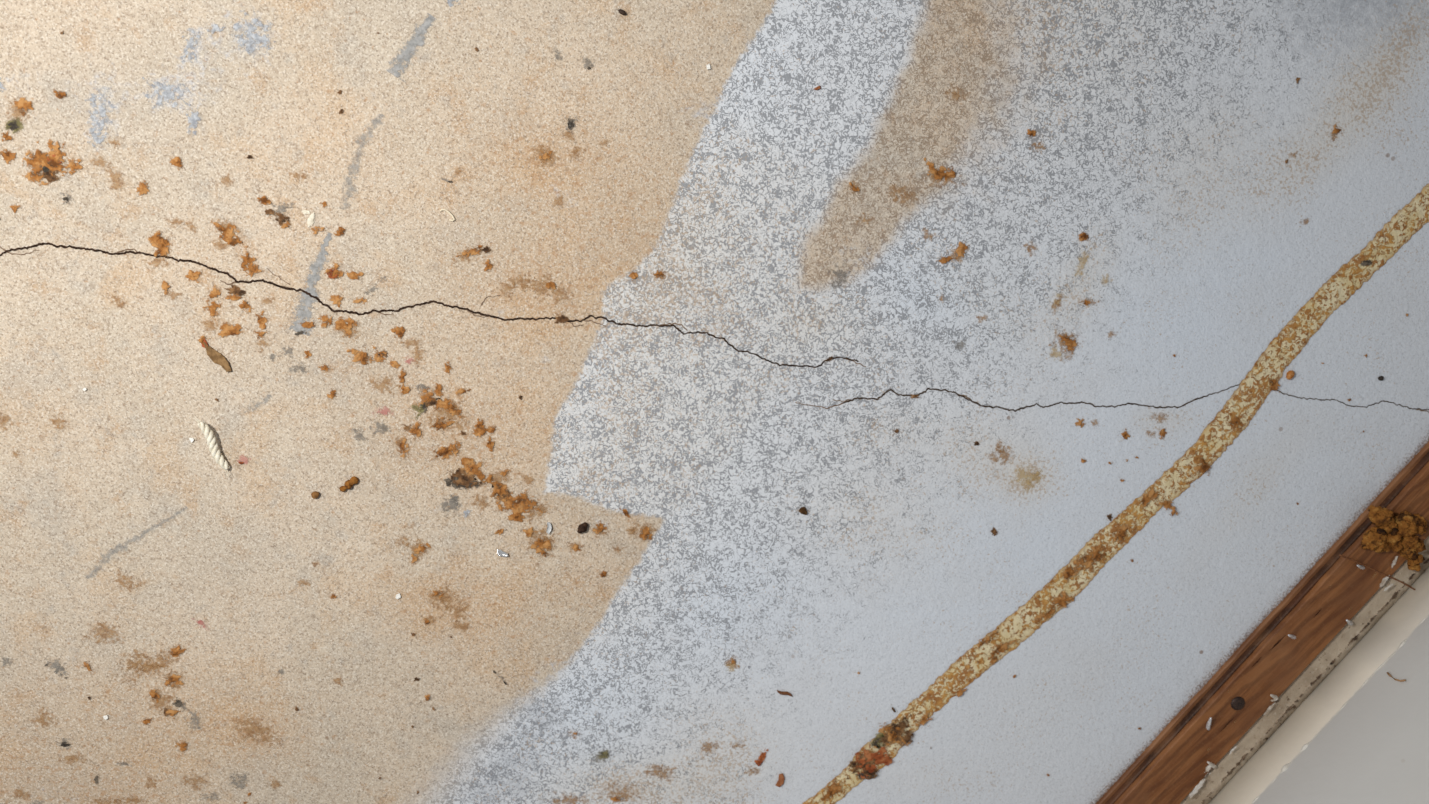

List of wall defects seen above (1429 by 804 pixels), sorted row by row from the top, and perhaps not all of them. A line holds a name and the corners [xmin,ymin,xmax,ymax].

corrosion [890,158,963,203]
corrosion [939,241,969,264]
corrosion [1079,232,1089,274]
crack [0,242,1239,412]
corrosion [1050,333,1077,361]
crack [1274,390,1429,412]
corrosion [972,514,1135,664]
corrosion [1093,438,1429,802]
corrosion [820,713,932,802]